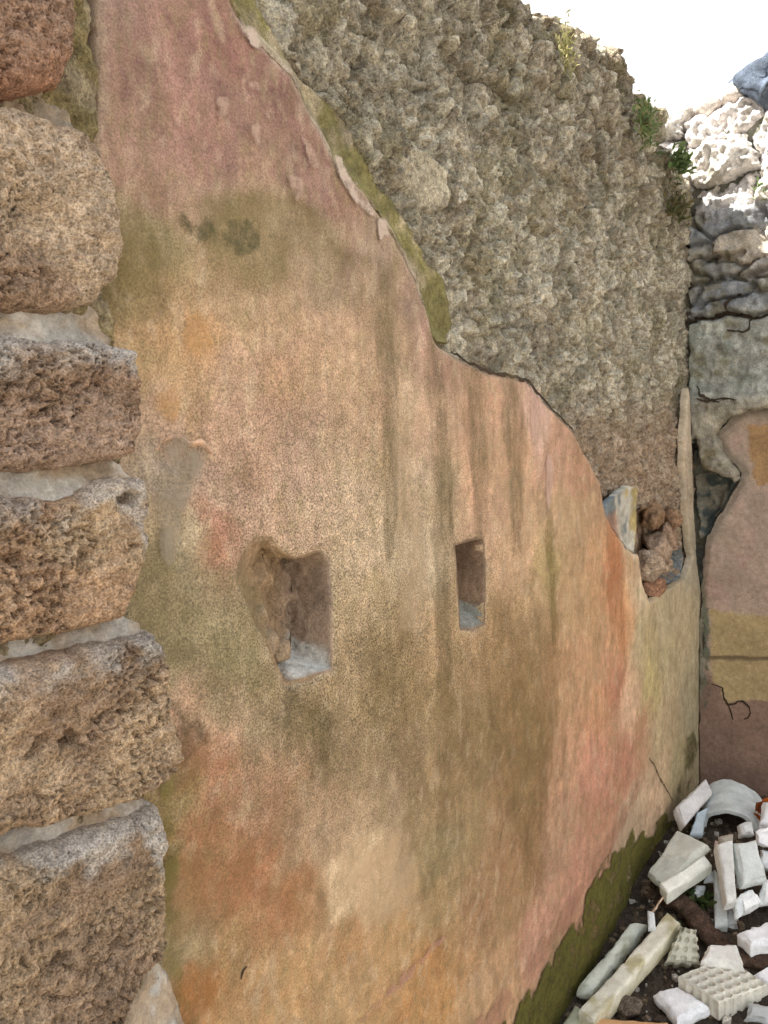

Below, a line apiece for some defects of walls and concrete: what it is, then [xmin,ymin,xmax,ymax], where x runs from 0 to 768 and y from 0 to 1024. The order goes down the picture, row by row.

spalling [241,0,768,598]
crack [696,386,736,403]
spalling [237,536,333,686]
crack [712,684,751,720]